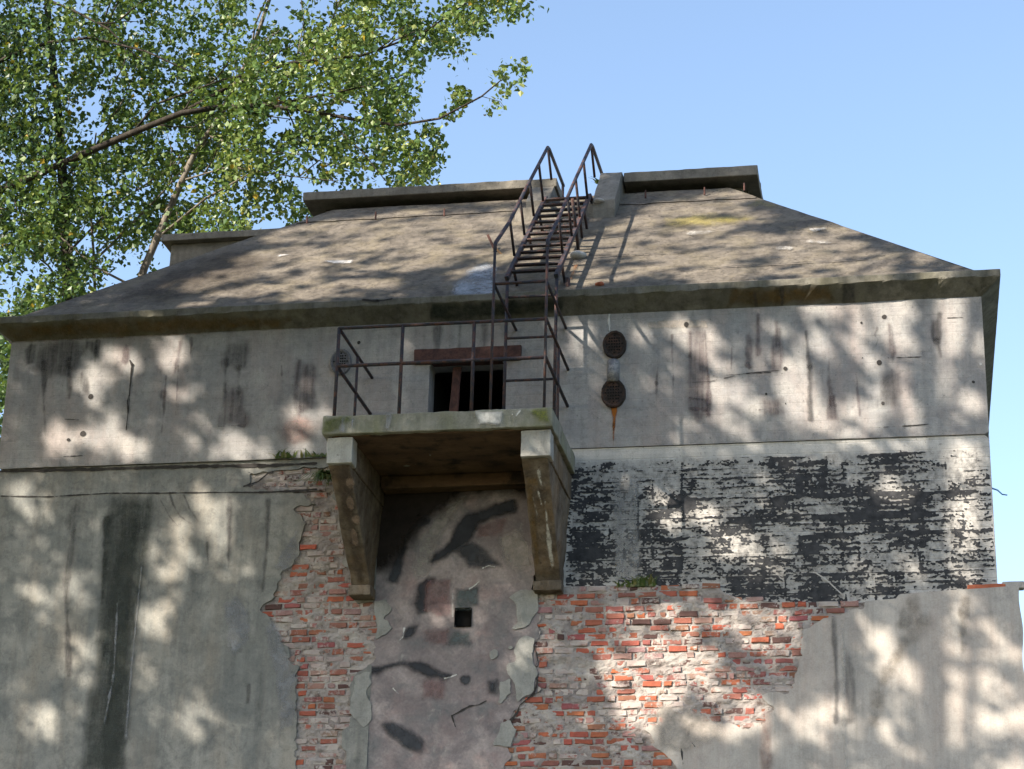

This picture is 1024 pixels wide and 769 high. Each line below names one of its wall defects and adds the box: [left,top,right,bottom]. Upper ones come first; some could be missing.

leakage [26,340,98,392]
leakage [86,499,150,769]
crack [0,455,317,498]
spalling [249,467,392,769]
spalling [490,450,996,769]